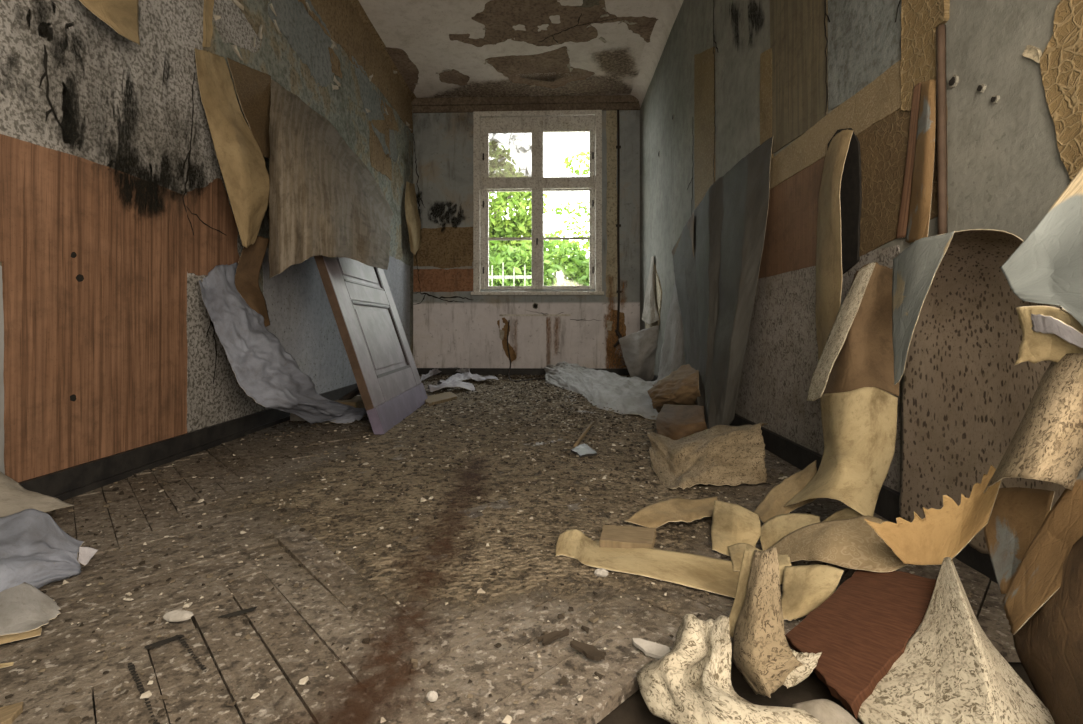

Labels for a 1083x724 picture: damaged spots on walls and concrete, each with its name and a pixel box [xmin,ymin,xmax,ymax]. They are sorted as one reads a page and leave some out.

damp [54,37,85,150]
peeling [385,47,419,93]
peeling [436,69,470,86]
peeling [449,0,658,89]
spalling [977,84,1000,104]
peeling [1022,45,1042,63]
damp [104,71,205,215]
peeling [896,74,959,243]
rust [546,318,558,363]
rust [604,277,627,369]